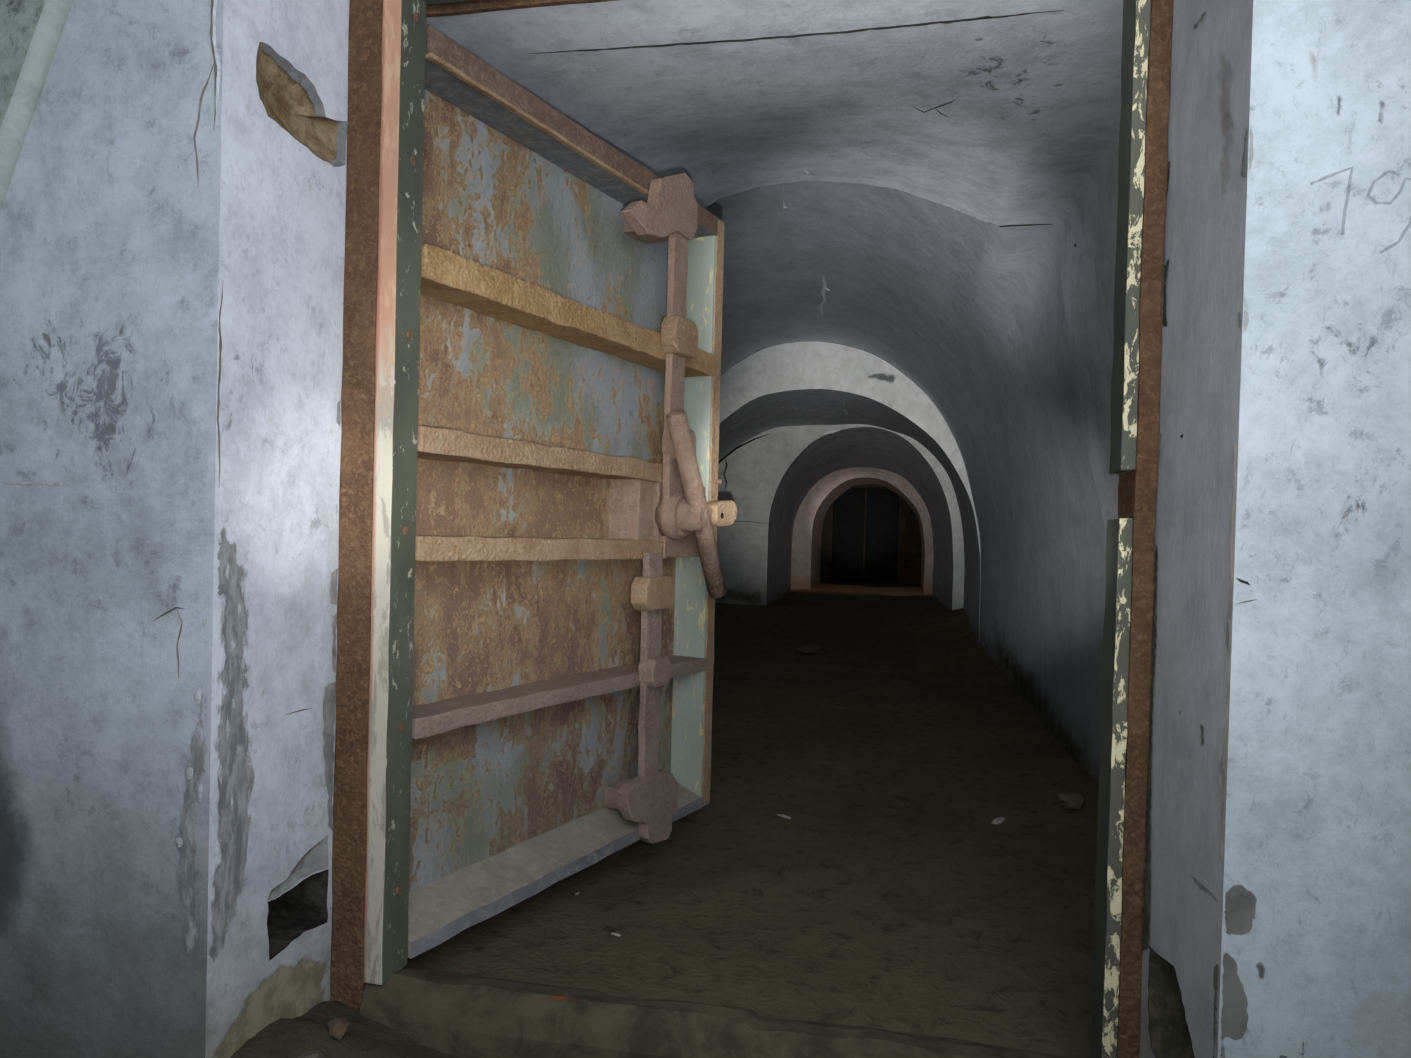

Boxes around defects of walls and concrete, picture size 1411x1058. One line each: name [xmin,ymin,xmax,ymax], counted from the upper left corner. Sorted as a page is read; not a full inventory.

crack [193,0,221,185]
crack [530,10,1071,54]
crack [216,285,224,488]
peeling [176,528,254,961]
peeling [213,569,338,1058]
spalling [1142,544,1195,1058]
peeling [1191,876,1257,934]